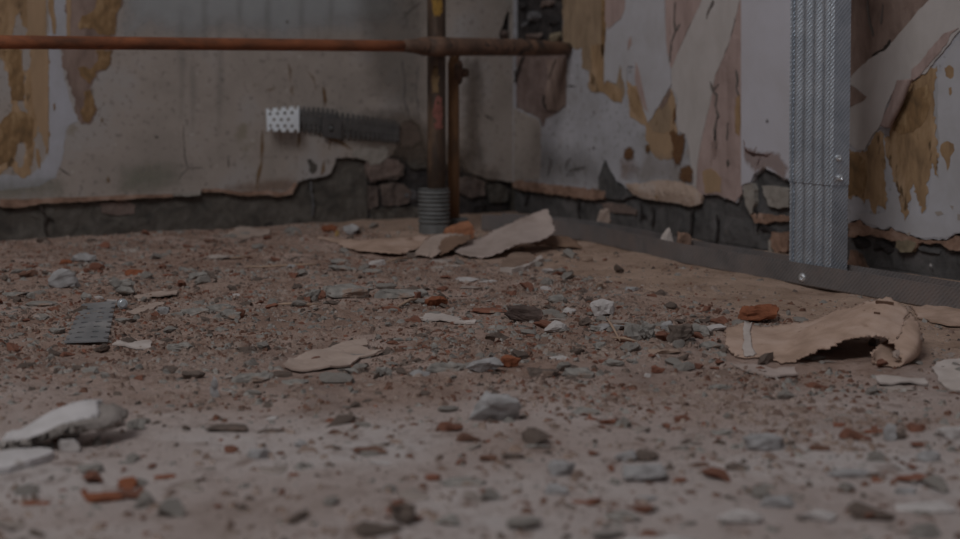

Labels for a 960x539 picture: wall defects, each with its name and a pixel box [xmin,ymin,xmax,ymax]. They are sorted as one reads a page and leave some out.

peeling [48,0,67,36]
spalling [499,0,563,42]
spalling [514,55,570,127]
spalling [0,49,427,248]
spalling [446,160,790,254]
peeling [847,40,960,281]